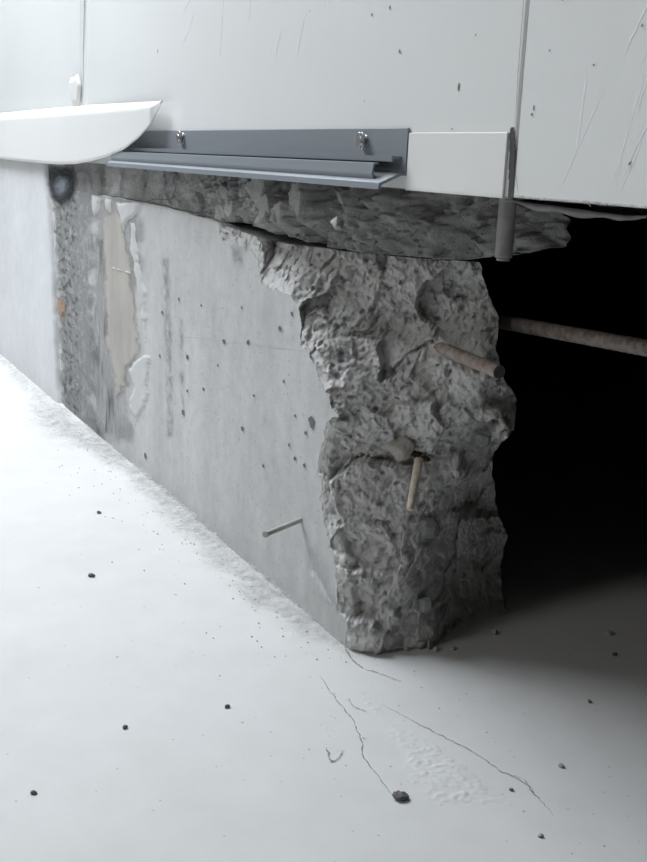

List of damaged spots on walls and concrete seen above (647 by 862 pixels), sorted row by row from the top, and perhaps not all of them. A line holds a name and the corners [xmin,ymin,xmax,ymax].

peeling [92,194,160,422]
spalling [219,222,647,655]
crack [343,645,401,682]
crack [322,678,395,799]
crack [385,705,556,818]